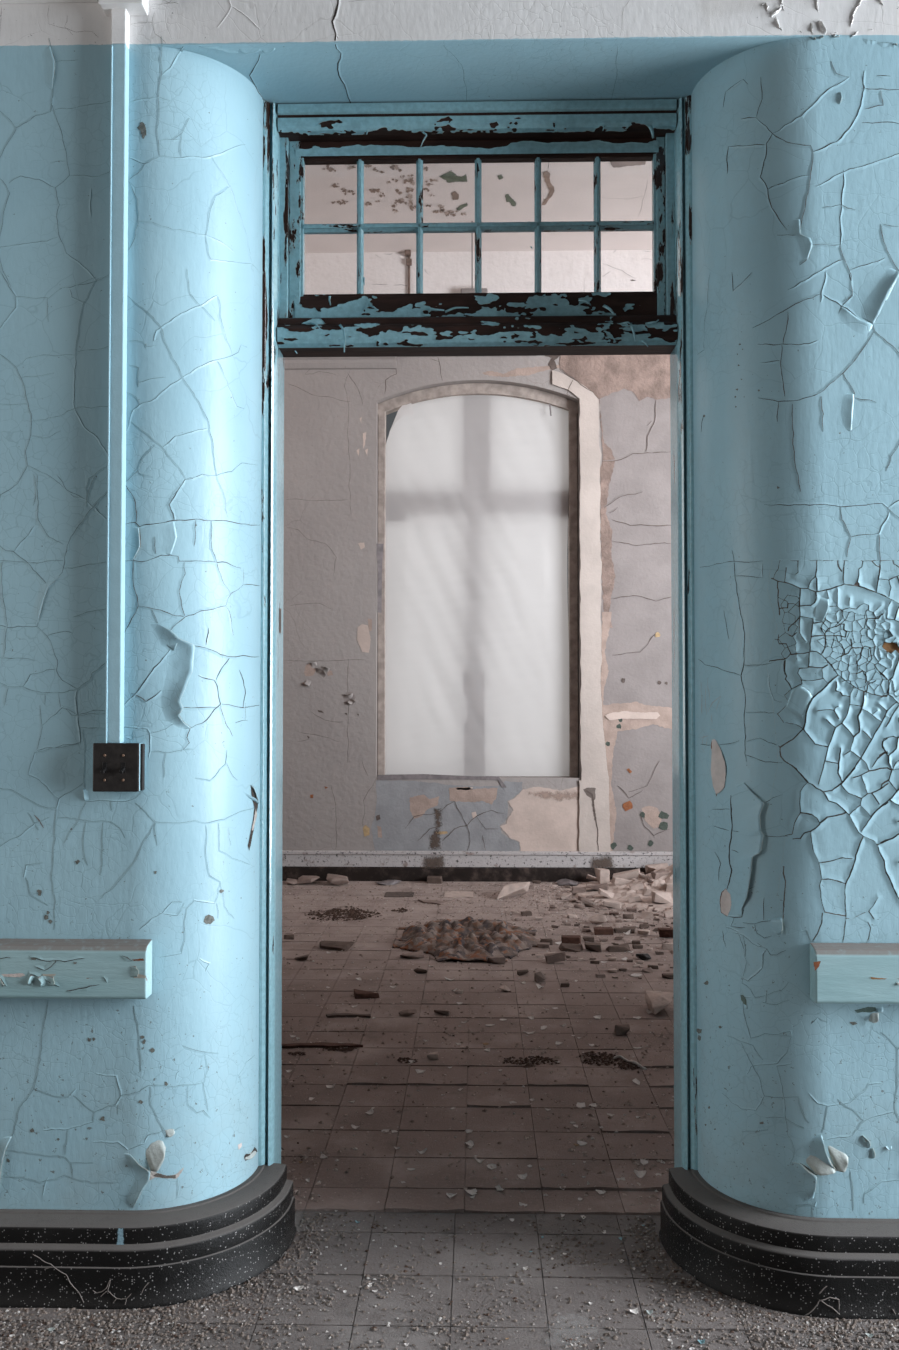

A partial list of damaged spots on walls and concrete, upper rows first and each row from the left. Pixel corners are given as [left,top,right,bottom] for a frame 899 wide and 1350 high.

peeling [800,0,872,38]
peeling [278,99,677,217]
crack [722,35,899,564]
crack [0,0,397,1195]
spalling [277,292,677,852]
crack [696,550,786,803]
peeling [710,560,899,943]
peeling [0,958,56,987]
crack [712,809,899,1163]
peeling [124,1129,184,1208]
peeling [792,1135,848,1201]
crack [849,1172,899,1210]